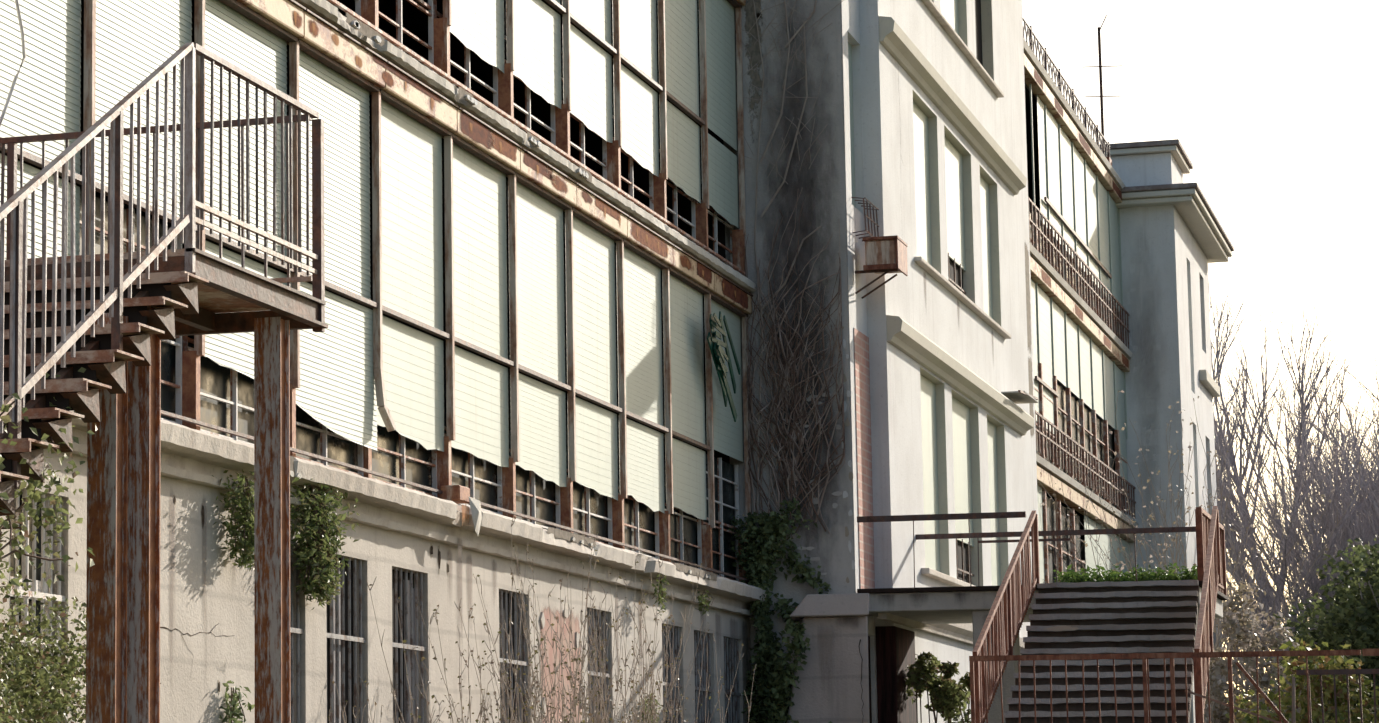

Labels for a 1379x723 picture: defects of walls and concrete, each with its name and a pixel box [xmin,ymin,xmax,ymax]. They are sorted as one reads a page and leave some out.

rust [294,11,339,46]
rust [356,55,442,110]
damp [744,0,763,133]
rust [1034,70,1063,117]
rust [460,112,748,309]
crack [160,624,235,678]
flaking render [540,607,582,723]